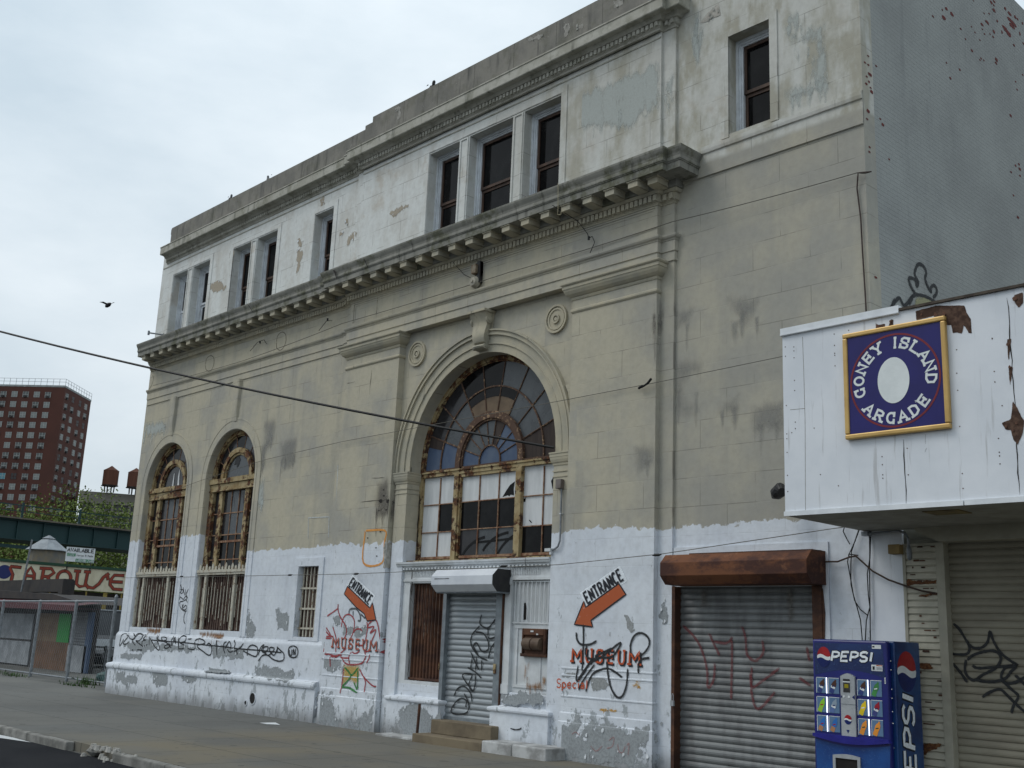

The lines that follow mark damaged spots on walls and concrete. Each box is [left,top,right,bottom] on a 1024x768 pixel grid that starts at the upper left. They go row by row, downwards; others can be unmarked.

peeling [210,281,226,292]
peeling [116,609,256,688]
peeling [251,663,295,683]
peeling [311,691,381,732]
peeling [561,712,663,768]